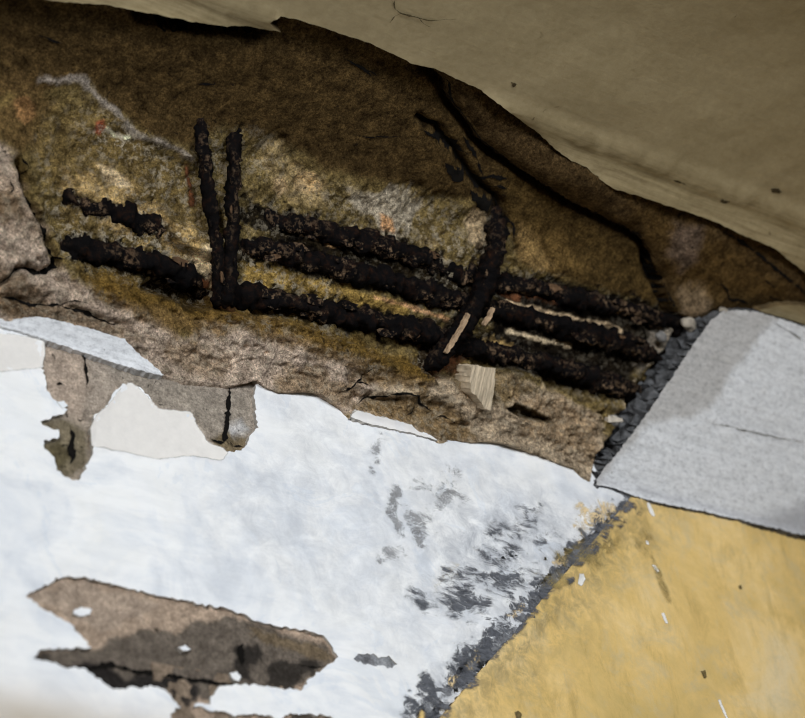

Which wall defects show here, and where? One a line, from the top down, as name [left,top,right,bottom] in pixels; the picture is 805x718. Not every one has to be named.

crack [391,1,453,27]
spalling [0,0,684,482]
corrosion [497,284,563,309]
damp [386,486,431,547]
damp [403,494,638,718]
flaking render [27,578,336,718]
flaking render [354,654,396,669]